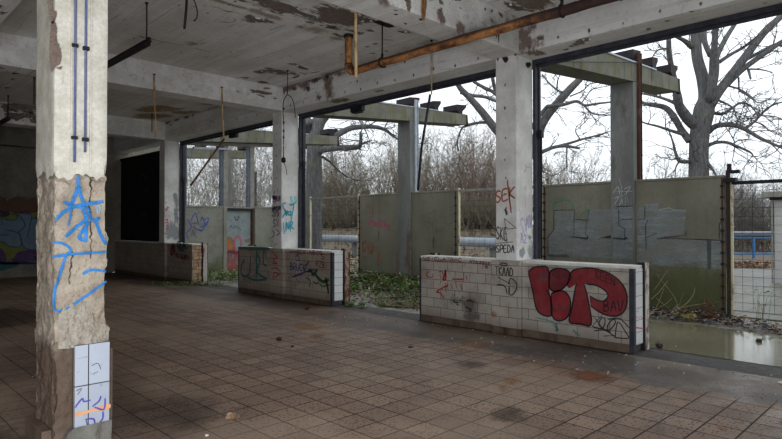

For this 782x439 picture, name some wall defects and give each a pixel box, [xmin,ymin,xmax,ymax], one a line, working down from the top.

peeling [484,0,555,23]
spalling [0,173,110,439]